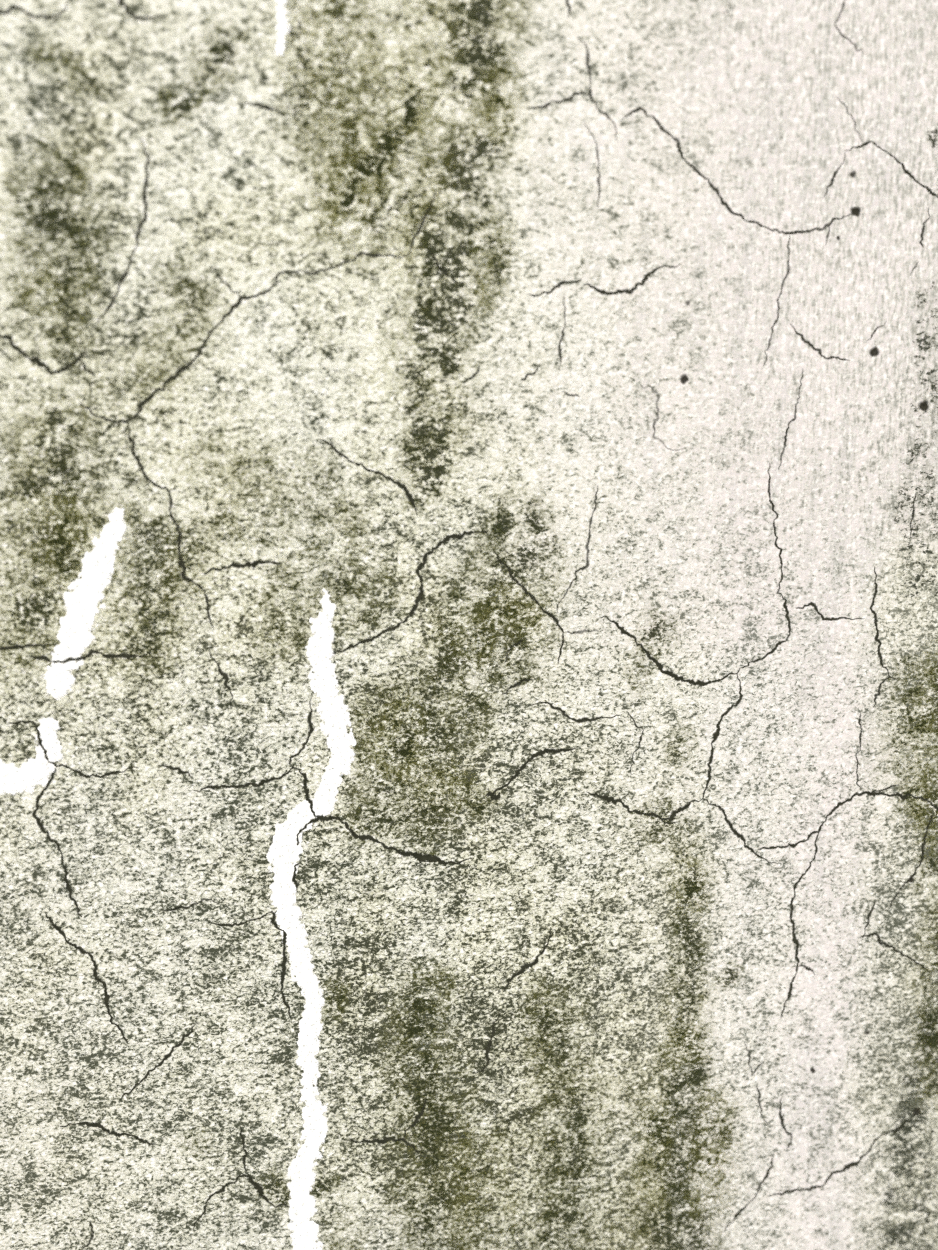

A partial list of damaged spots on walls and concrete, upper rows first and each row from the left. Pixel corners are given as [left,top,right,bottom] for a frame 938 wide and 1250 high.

damp [1,143,112,357]
crack [0,138,149,376]
damp [282,0,540,512]
crack [0,644,152,663]
damp [0,381,242,676]
crack [79,192,463,709]
damp [347,495,570,854]
crack [320,0,938,1019]
crack [0,699,469,1043]
damp [380,793,742,1250]
crack [724,1044,915,1232]
damp [857,652,938,1250]